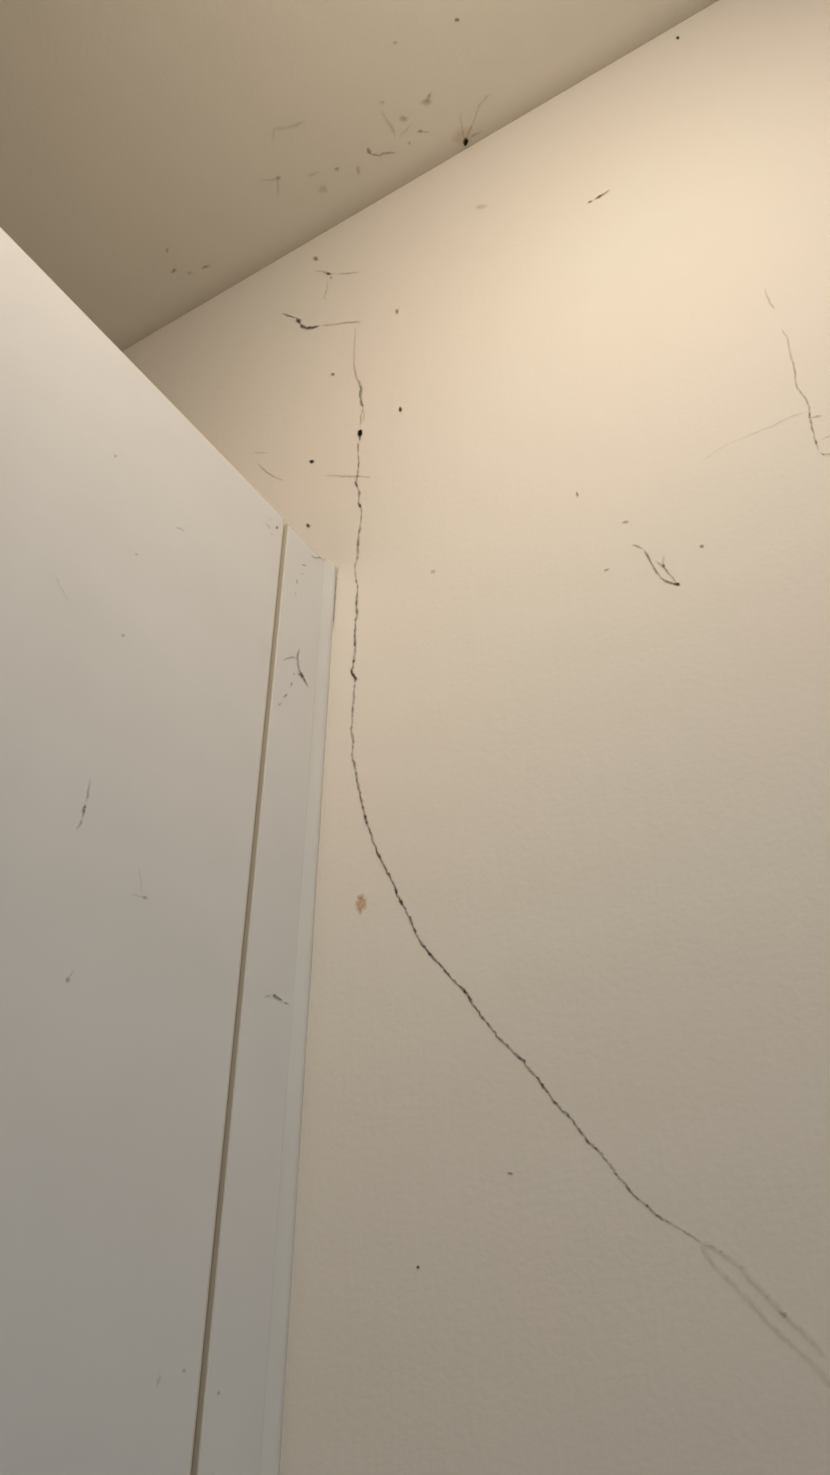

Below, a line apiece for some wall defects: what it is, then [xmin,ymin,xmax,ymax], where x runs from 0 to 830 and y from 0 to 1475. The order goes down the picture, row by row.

crack [351,386,661,1218]